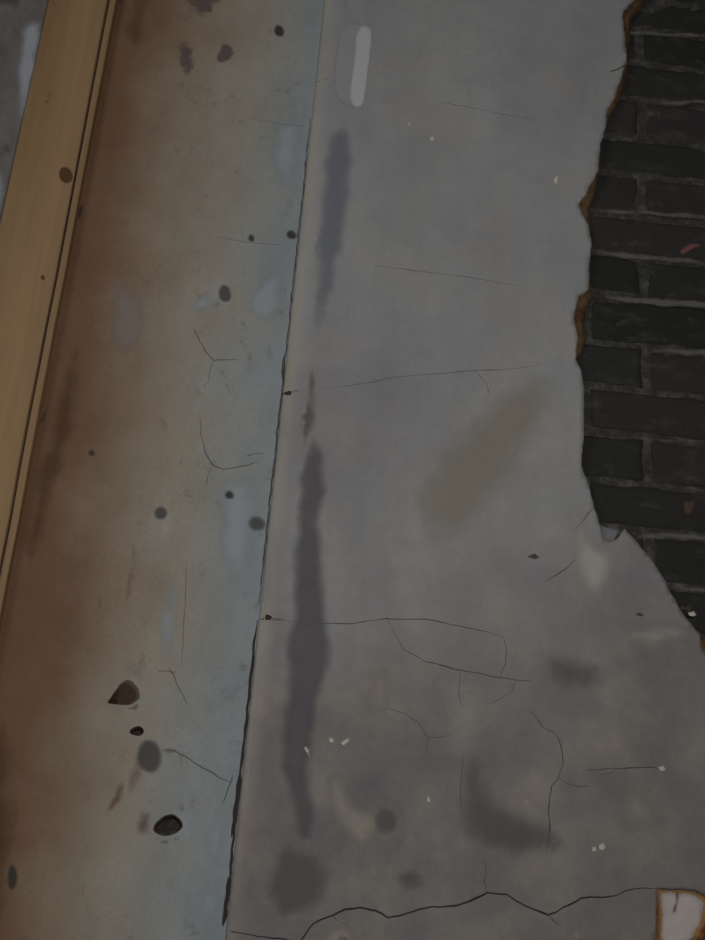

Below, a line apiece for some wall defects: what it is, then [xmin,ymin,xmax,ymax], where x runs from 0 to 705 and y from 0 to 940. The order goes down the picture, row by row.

leakage [285,453,326,832]
crack [165,119,659,940]
spalling [656,889,705,940]